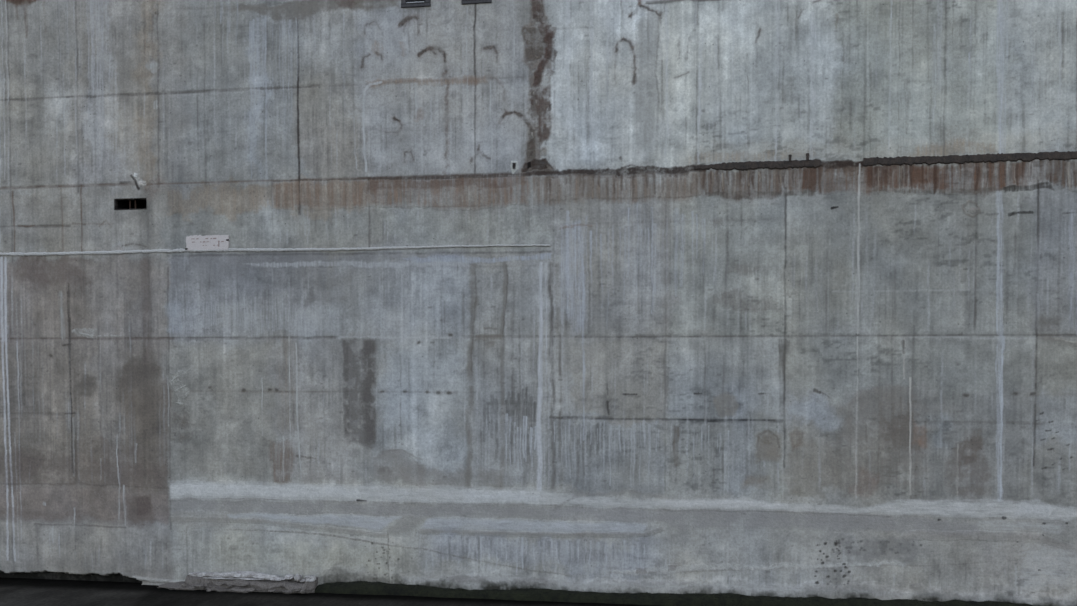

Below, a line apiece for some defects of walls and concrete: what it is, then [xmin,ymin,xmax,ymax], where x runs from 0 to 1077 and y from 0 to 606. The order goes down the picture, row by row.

rust [3,0,47,39]
spalling [509,0,559,174]
rust [270,136,1077,250]
damp [0,0,740,583]
damp [707,260,785,315]
damp [740,163,1006,506]
damp [1032,209,1077,349]
damp [835,531,924,568]